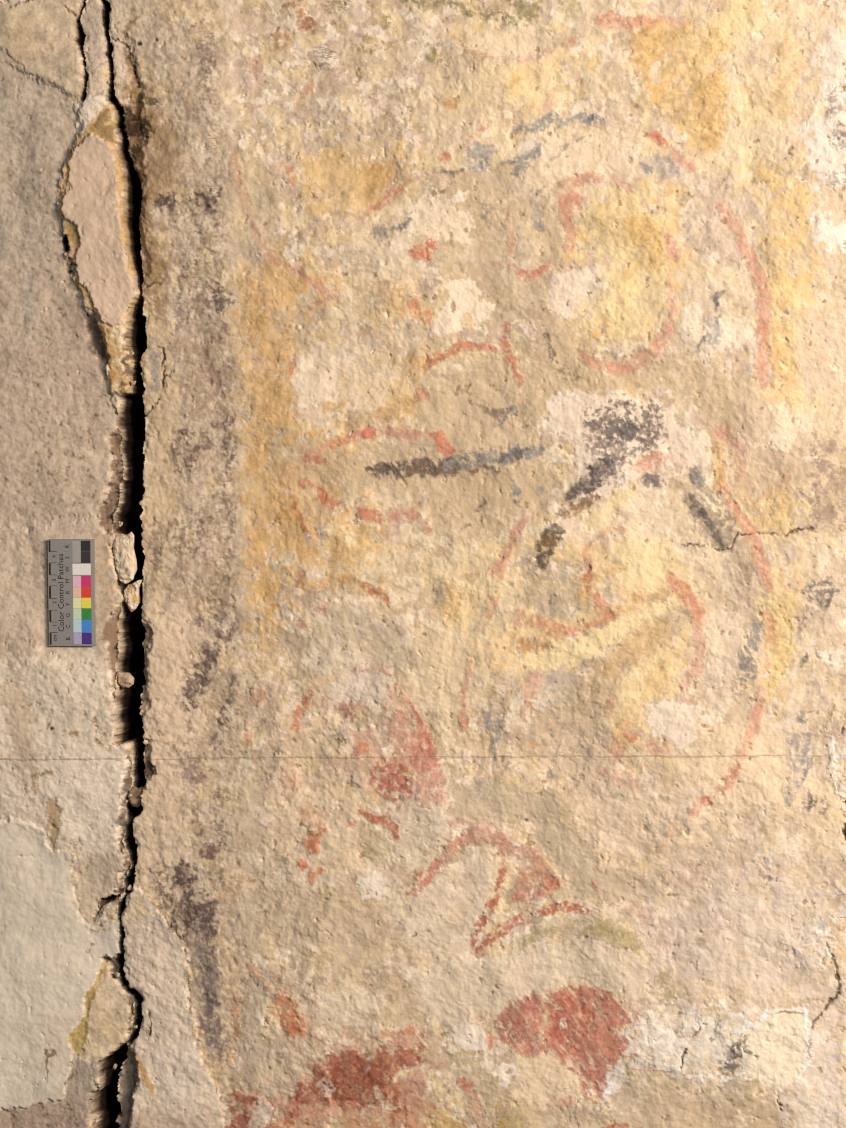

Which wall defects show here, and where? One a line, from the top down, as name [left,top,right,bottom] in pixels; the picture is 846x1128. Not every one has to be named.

spalling [0,0,144,397]
crack [60,0,209,1128]
crack [823,703,846,736]
crack [830,769,846,842]
peeling [0,795,233,1128]
spalling [695,1002,816,1095]
crack [776,1091,784,1128]
crack [797,933,842,1060]